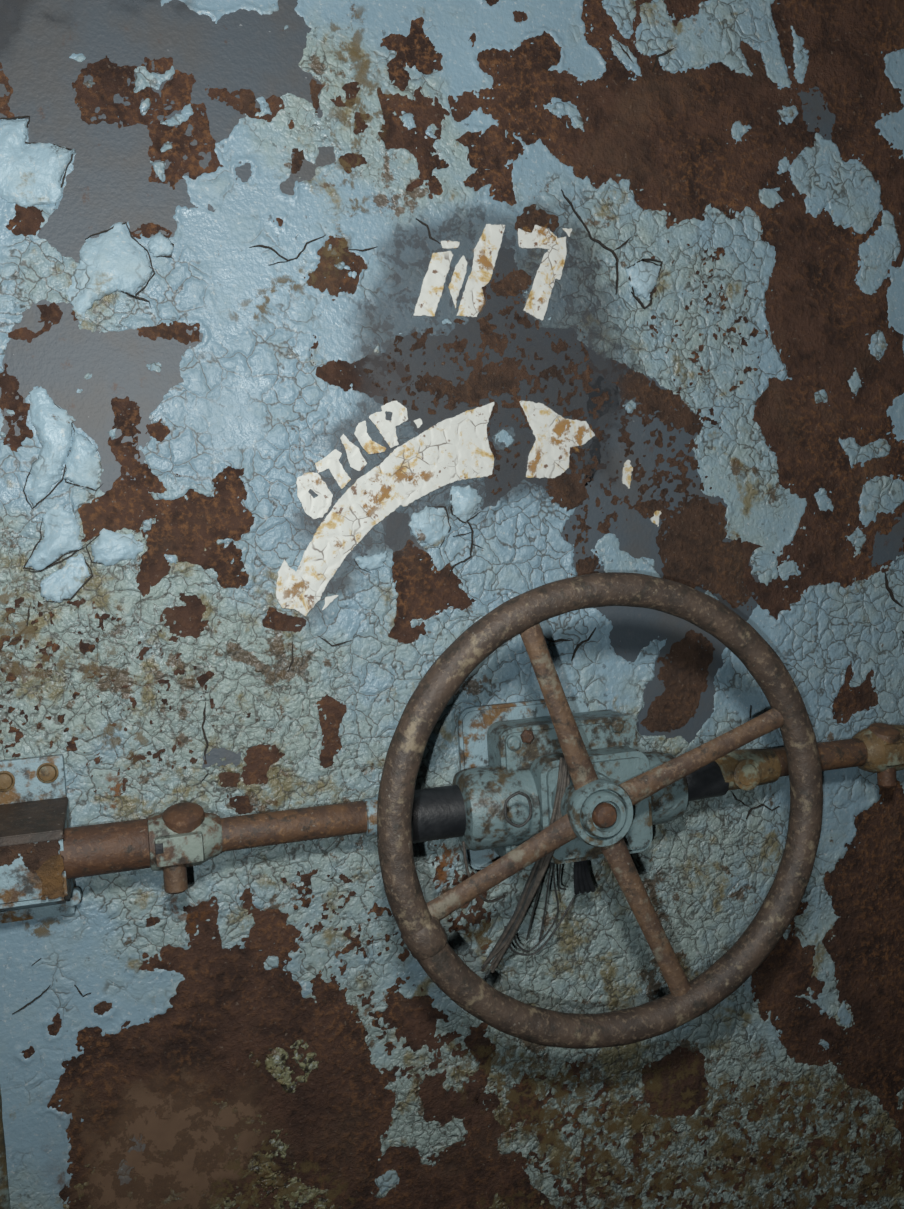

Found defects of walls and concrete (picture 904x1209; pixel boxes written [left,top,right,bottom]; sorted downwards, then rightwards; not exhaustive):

corrosion [72,55,295,190]
peeling [0,0,323,509]
corrosion [309,0,904,620]
crack [561,189,663,309]
peeling [354,247,759,621]
crack [28,547,84,572]
peeling [86,528,144,566]
corrosion [388,539,476,644]
crack [448,520,481,577]
crack [200,702,208,782]
peeling [595,606,727,744]
corrosion [47,779,904,1209]